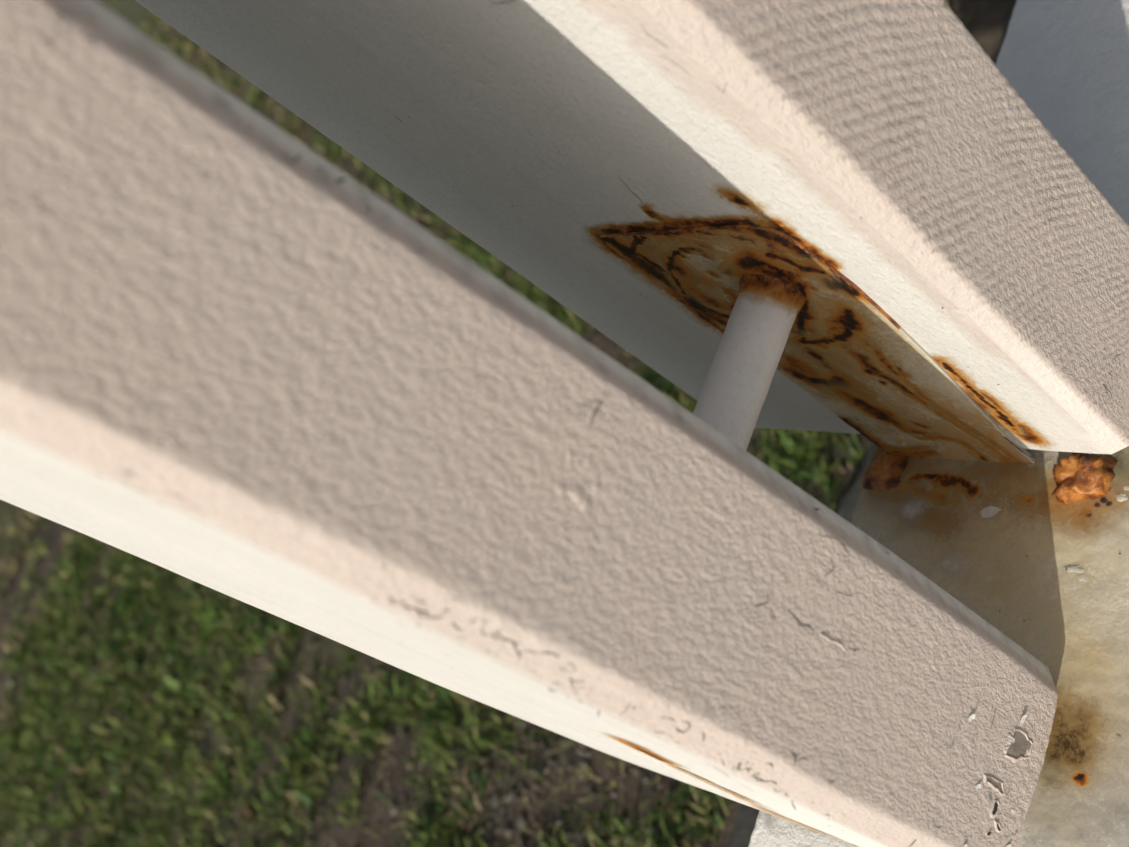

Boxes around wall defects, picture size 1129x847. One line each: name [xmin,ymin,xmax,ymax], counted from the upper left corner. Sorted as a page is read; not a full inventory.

corrosion [588,188,1050,490]
corrosion [1051,452,1117,504]
water stain [854,446,1129,847]
peeling [969,714,1033,836]
corrosion [1042,687,1102,787]